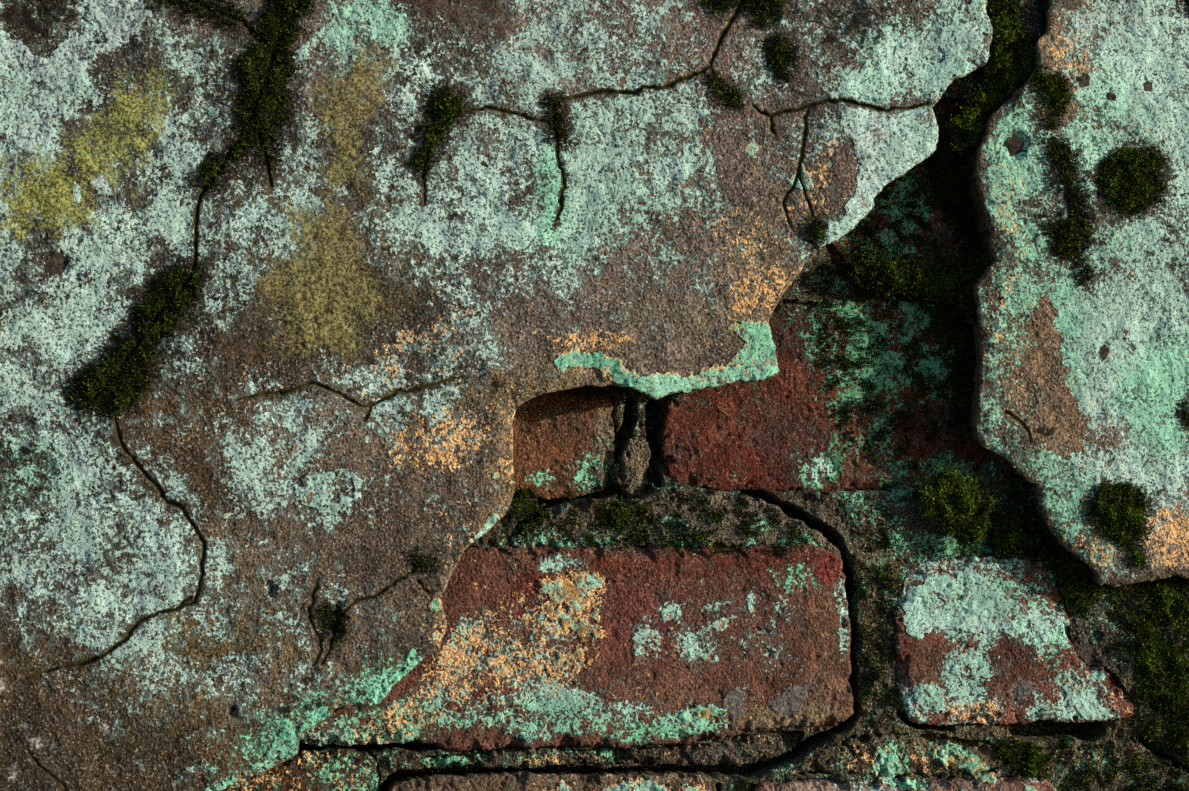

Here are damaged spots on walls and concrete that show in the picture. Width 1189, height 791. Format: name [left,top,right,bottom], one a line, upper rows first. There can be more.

water stain [0,74,174,239]
water stain [316,48,394,188]
crack [420,0,935,234]
crack [25,0,302,679]
water stain [218,202,381,369]
crack [236,375,465,422]
peeling [554,319,779,400]
spalling [968,94,1115,588]
water stain [1037,422,1068,436]
peeling [355,648,422,707]
peeling [205,711,331,791]
peeling [602,777,668,791]